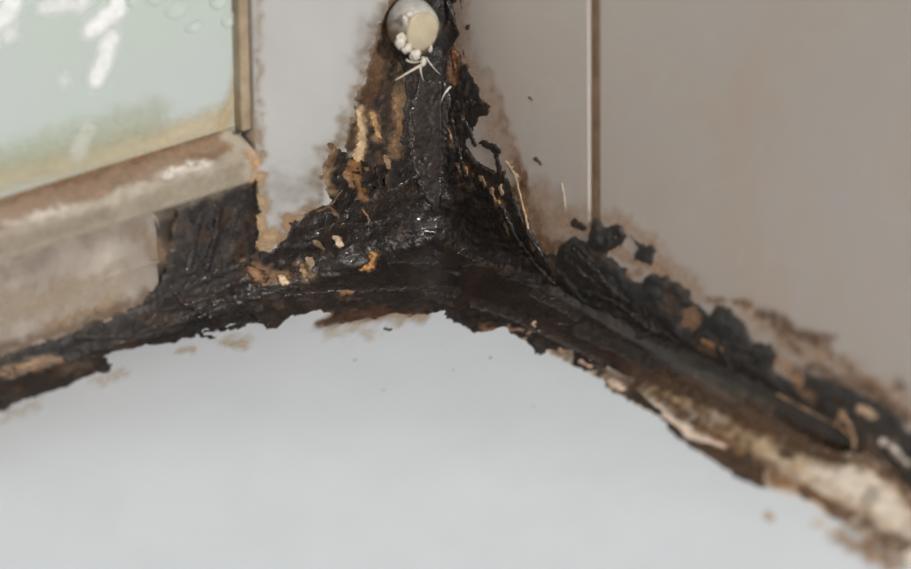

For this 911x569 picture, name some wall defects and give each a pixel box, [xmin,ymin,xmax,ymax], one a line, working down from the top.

water stain [0,0,23,42]
water stain [39,0,92,14]
water stain [89,29,120,88]
water stain [345,0,491,213]
water stain [0,90,234,189]
water stain [0,142,911,522]
water stain [836,516,911,569]